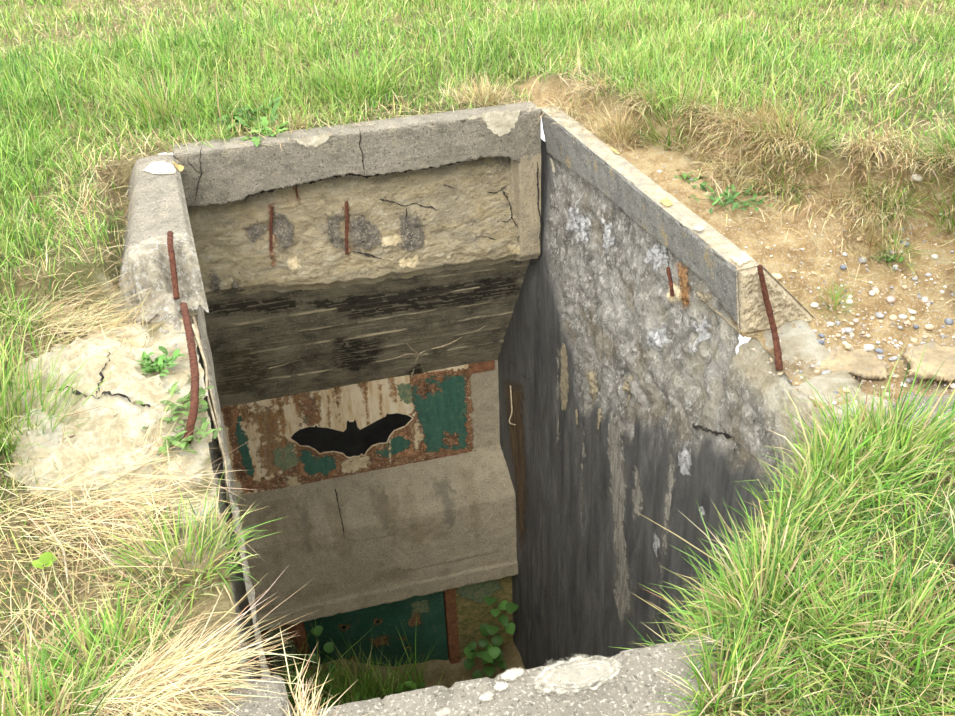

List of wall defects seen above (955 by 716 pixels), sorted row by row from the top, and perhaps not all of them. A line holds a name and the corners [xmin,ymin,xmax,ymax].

spalling [467,110,520,137]
crack [245,133,461,198]
water stain [244,214,294,248]
spalling [188,157,520,297]
water stain [327,209,382,251]
crack [379,199,436,220]
water stain [397,212,425,251]
corrosion [676,263,689,306]
spalling [721,251,895,493]
corrosion [221,367,474,494]
spalling [0,231,299,684]